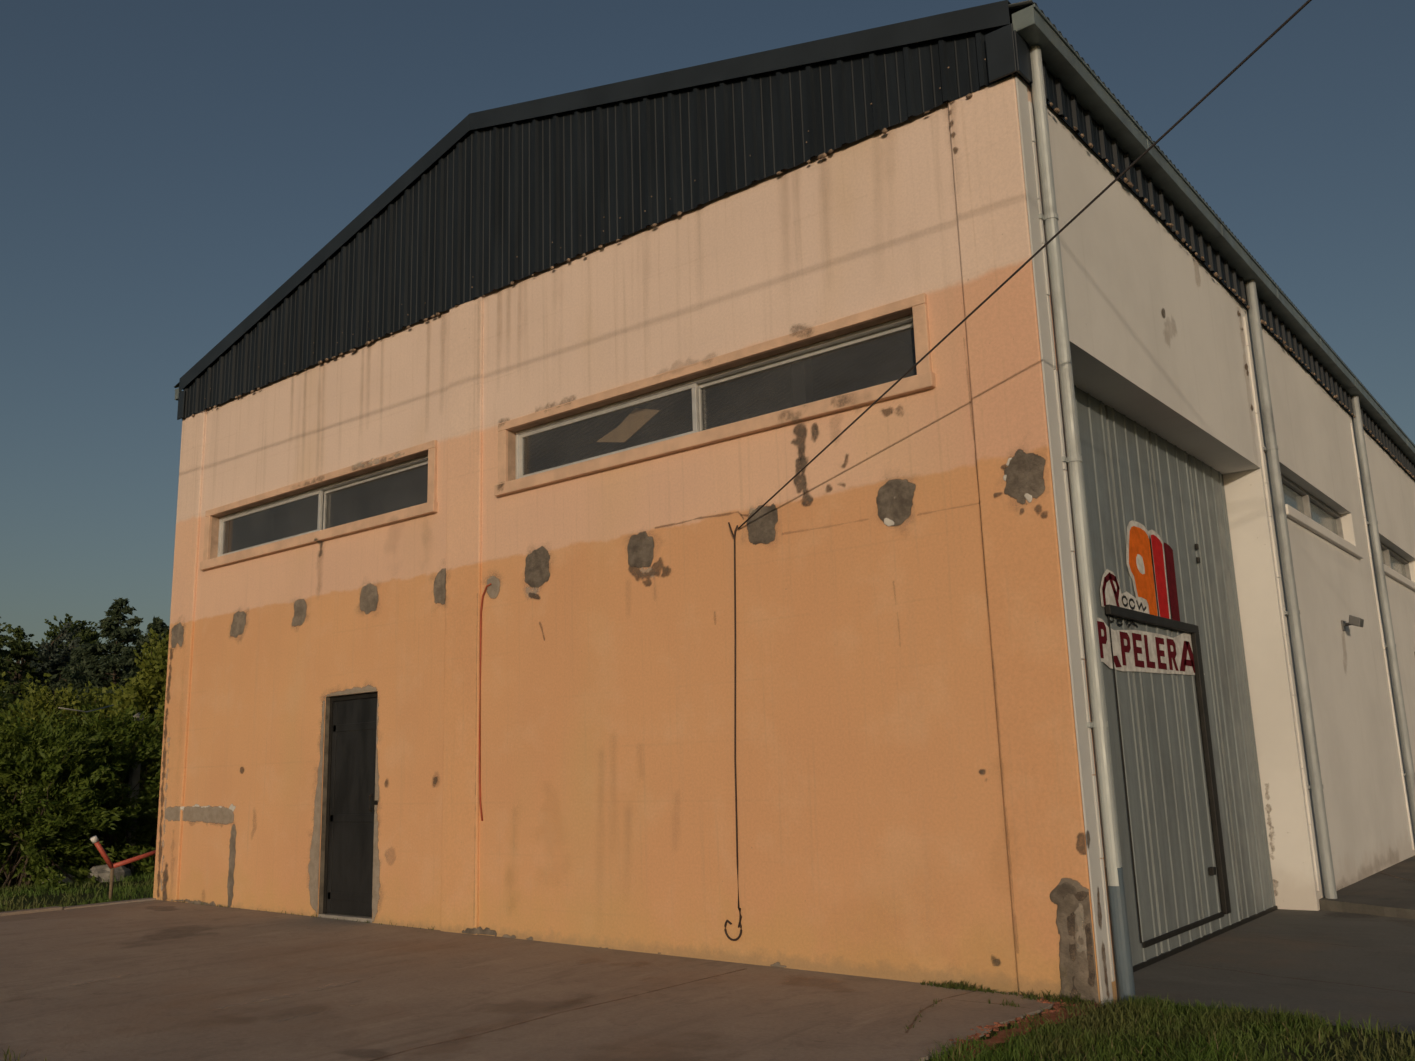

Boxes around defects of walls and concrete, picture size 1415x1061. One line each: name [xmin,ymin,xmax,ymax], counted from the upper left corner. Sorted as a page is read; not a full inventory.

peeling [157,649,236,906]
spalling [1050,878,1109,1003]